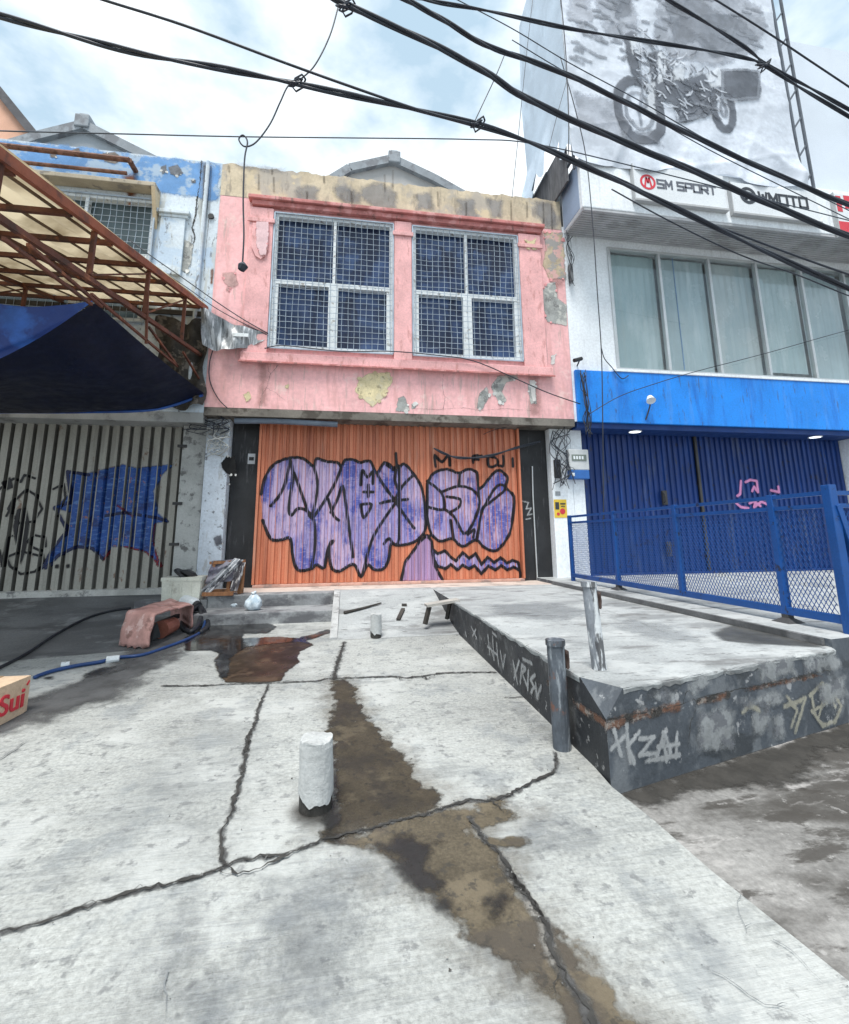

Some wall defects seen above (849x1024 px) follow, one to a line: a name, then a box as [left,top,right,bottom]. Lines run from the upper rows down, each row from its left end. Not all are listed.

peeling [160,165,196,183]
water stain [298,185,318,200]
water stain [336,184,396,208]
water stain [416,193,432,209]
water stain [457,200,477,217]
water stain [487,198,502,217]
peeling [525,230,567,326]
peeling [355,371,418,414]
peeling [477,375,537,411]
crack [0,641,600,1024]
water stain [294,679,636,1024]